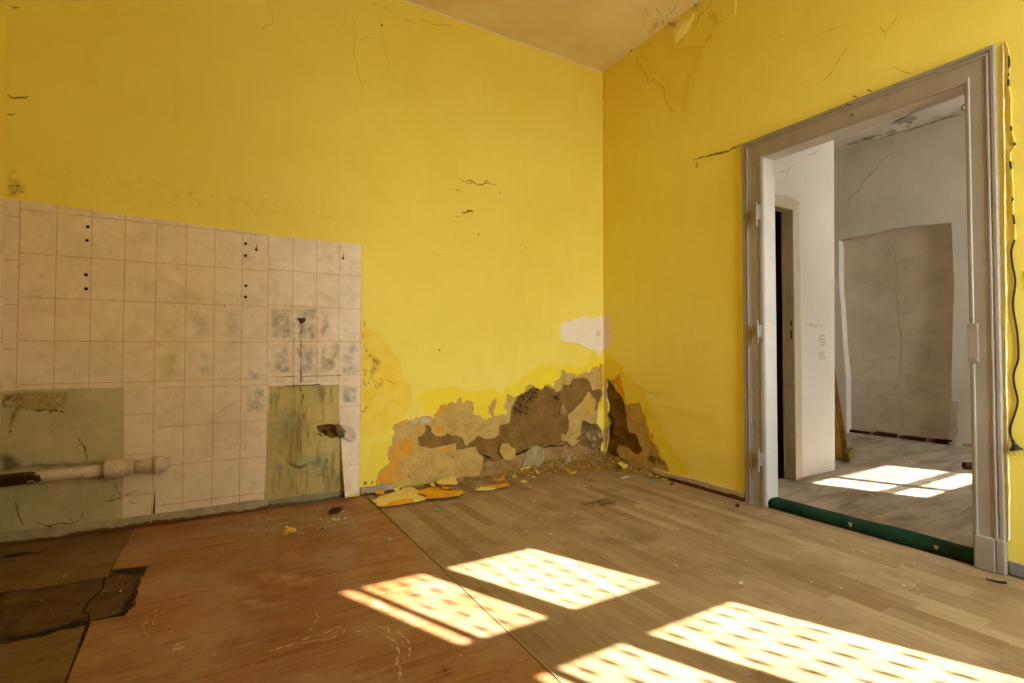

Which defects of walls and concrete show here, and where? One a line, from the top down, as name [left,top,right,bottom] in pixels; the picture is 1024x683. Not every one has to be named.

peeling [376,309,669,511]